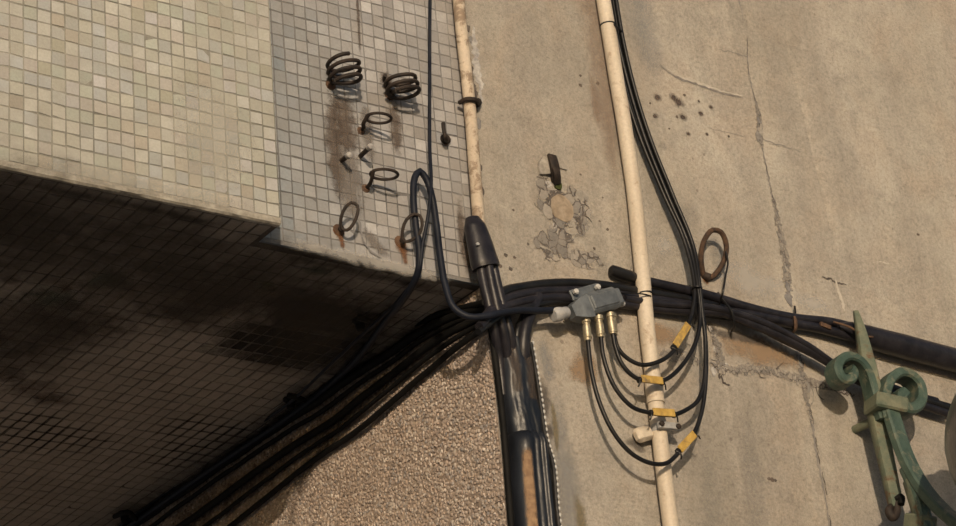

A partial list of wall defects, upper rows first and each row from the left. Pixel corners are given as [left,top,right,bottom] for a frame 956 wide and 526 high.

water stain [0,181,420,379]
rust [325,98,358,190]
peeling [527,175,609,270]
crack [711,38,800,307]
crack [710,350,855,526]